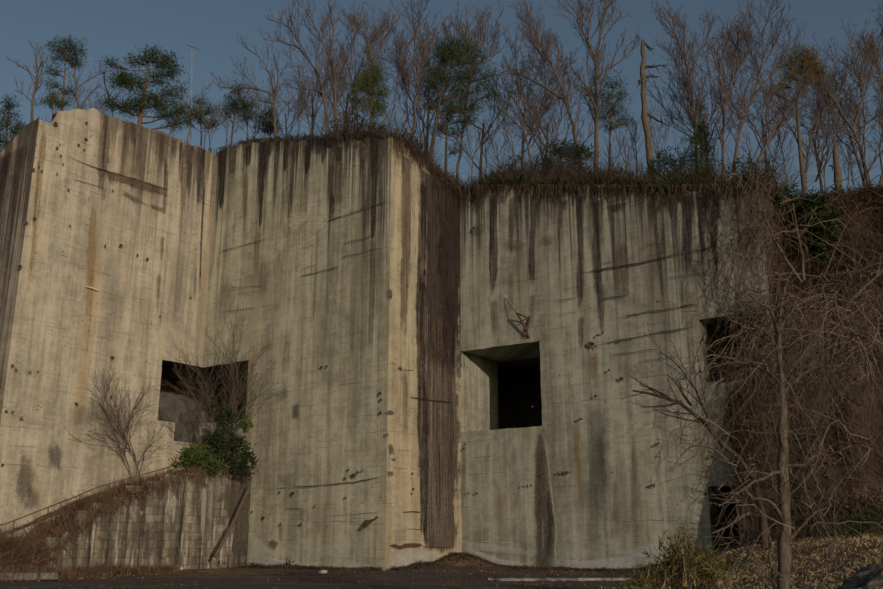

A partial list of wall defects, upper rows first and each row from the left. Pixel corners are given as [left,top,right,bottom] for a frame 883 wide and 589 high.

damp [246,130,378,271]
damp [472,193,537,289]
damp [566,196,604,320]
damp [669,189,731,282]
damp [401,153,463,552]